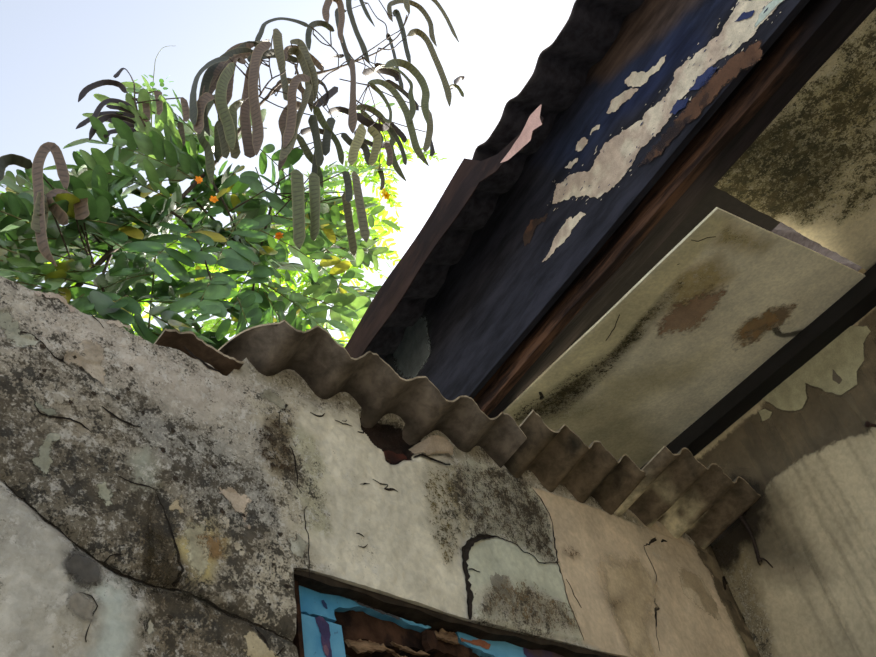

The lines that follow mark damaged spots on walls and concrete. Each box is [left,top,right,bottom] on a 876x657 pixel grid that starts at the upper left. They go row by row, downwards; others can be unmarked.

peeling [523,0,783,262]
spalling [360,418,454,465]
peeling [697,310,876,493]
crack [4,476,294,656]
peeling [461,638,491,649]
water stain [424,464,556,565]
peeling [523,647,564,657]
crack [644,538,667,650]